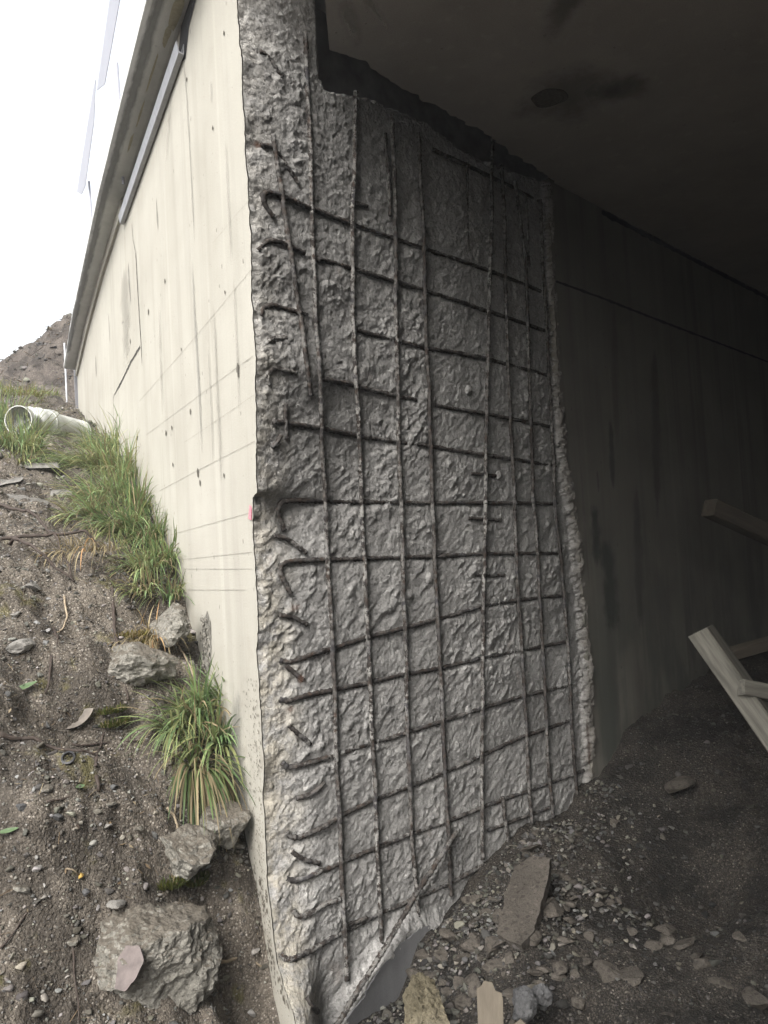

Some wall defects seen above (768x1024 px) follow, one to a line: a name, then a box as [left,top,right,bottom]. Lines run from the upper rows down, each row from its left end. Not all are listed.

spalling [238,0,596,1024]